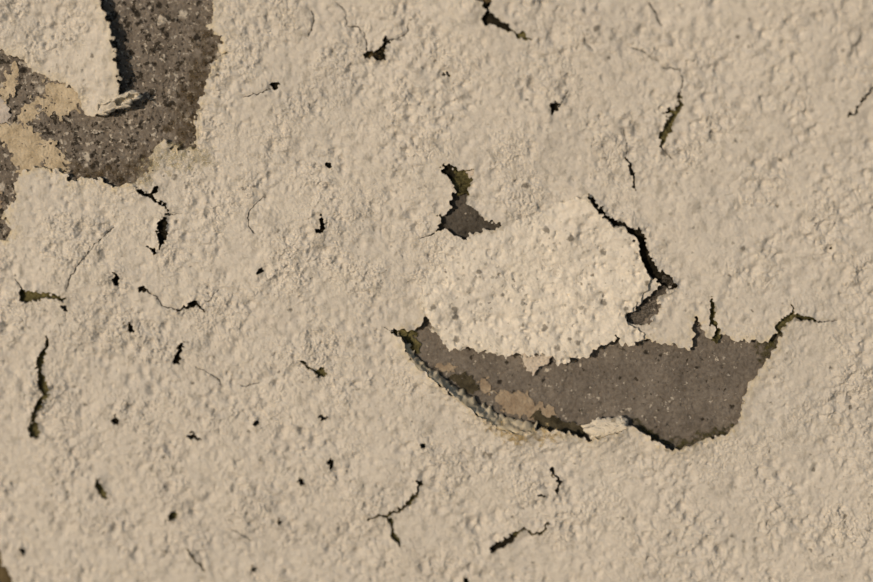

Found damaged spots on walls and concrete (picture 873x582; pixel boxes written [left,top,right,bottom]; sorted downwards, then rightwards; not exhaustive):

crack [337,3,411,61]
peeling [0,0,227,240]
crack [630,47,684,159]
crack [14,227,114,319]
crack [137,186,182,255]
crack [146,290,218,312]
peeling [397,163,786,451]
crack [587,193,678,325]
crack [28,335,51,437]
peeling [0,551,12,582]
crack [368,480,423,546]
crack [489,522,549,552]